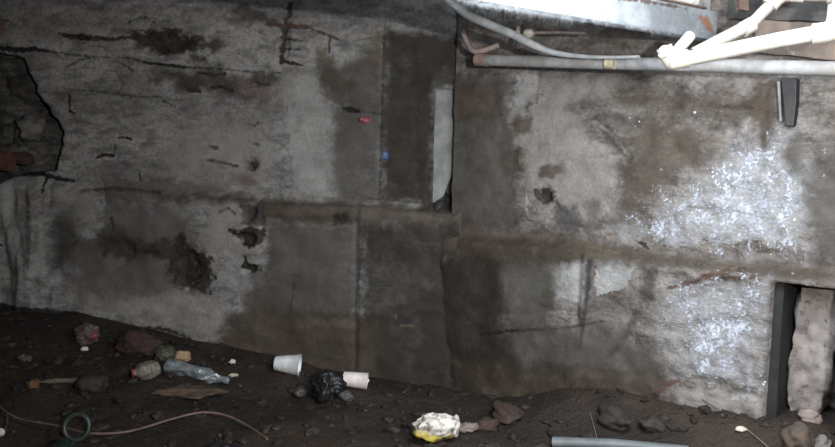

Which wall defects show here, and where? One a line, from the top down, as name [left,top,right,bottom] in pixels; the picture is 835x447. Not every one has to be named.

crack [0,45,95,65]
crack [124,2,303,74]
spalling [14,113,47,142]
flaking render [49,188,273,344]
damp [0,32,381,297]
damp [243,224,360,331]
damp [362,30,835,399]